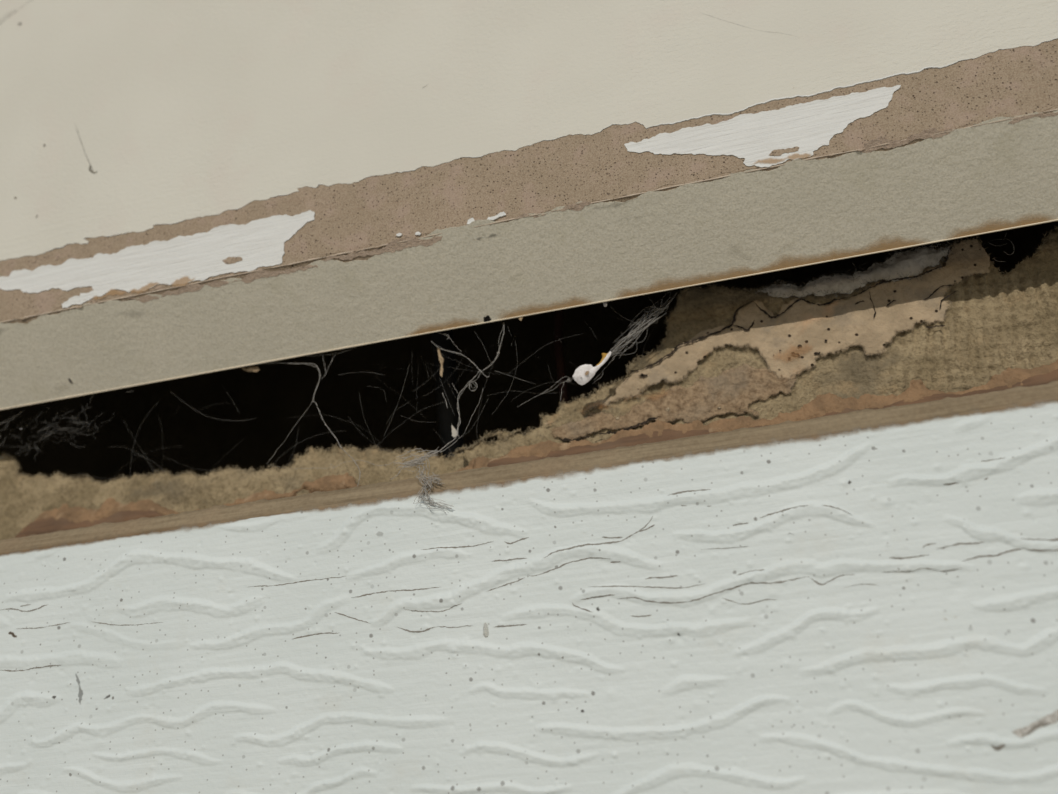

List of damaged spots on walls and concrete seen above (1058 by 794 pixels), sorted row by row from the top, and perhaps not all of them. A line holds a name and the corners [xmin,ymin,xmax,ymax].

peeling [0,39,1058,322]
spalling [0,333,443,483]
peeling [0,381,1058,555]
spalling [452,221,1058,447]